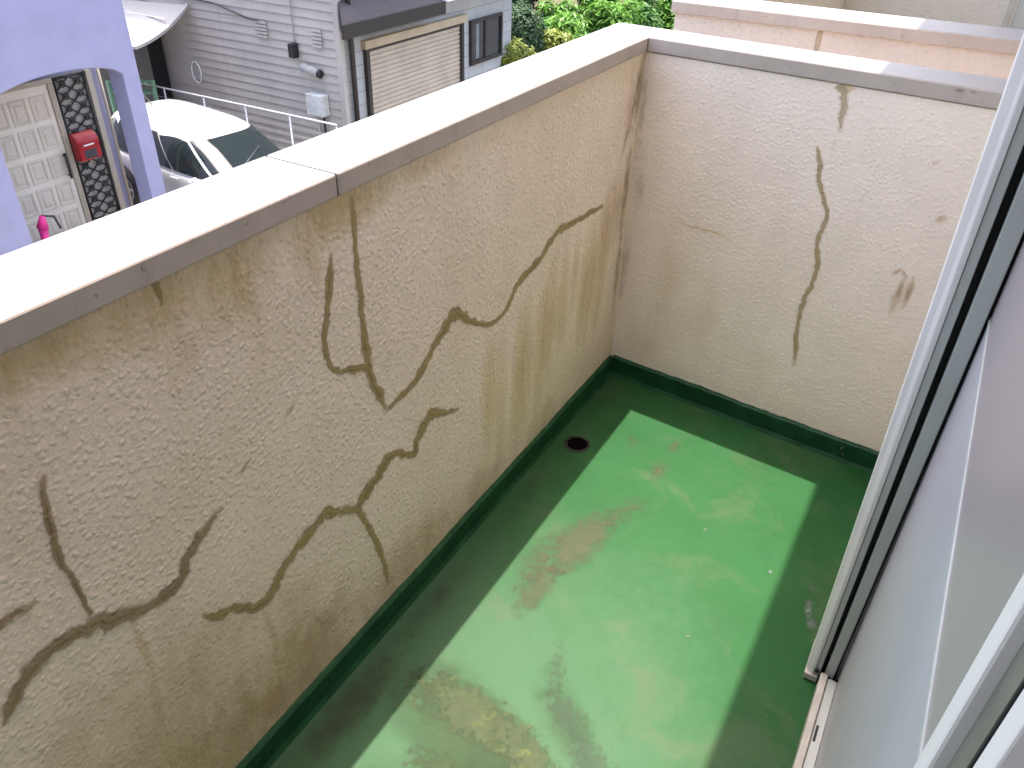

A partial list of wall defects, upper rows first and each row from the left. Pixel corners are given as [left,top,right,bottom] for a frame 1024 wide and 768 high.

crack [322,196,603,411]
crack [793,146,829,359]
crack [0,475,223,726]
crack [202,408,459,621]